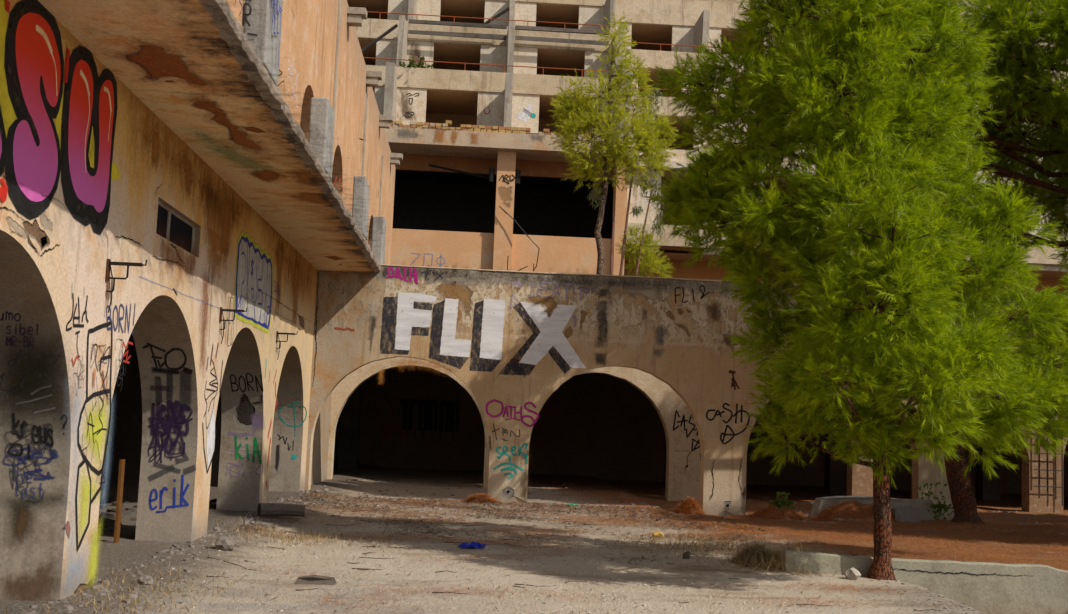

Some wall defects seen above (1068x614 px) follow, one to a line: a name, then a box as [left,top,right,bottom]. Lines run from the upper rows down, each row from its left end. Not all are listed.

spalling [119,42,266,153]
spalling [247,166,281,182]
water stain [142,117,241,270]
crack [0,206,59,256]
spalling [23,219,50,250]
water stain [276,244,311,323]
peeling [515,286,557,317]
peeling [564,310,588,339]
peeling [665,308,691,337]
crack [894,568,1033,577]